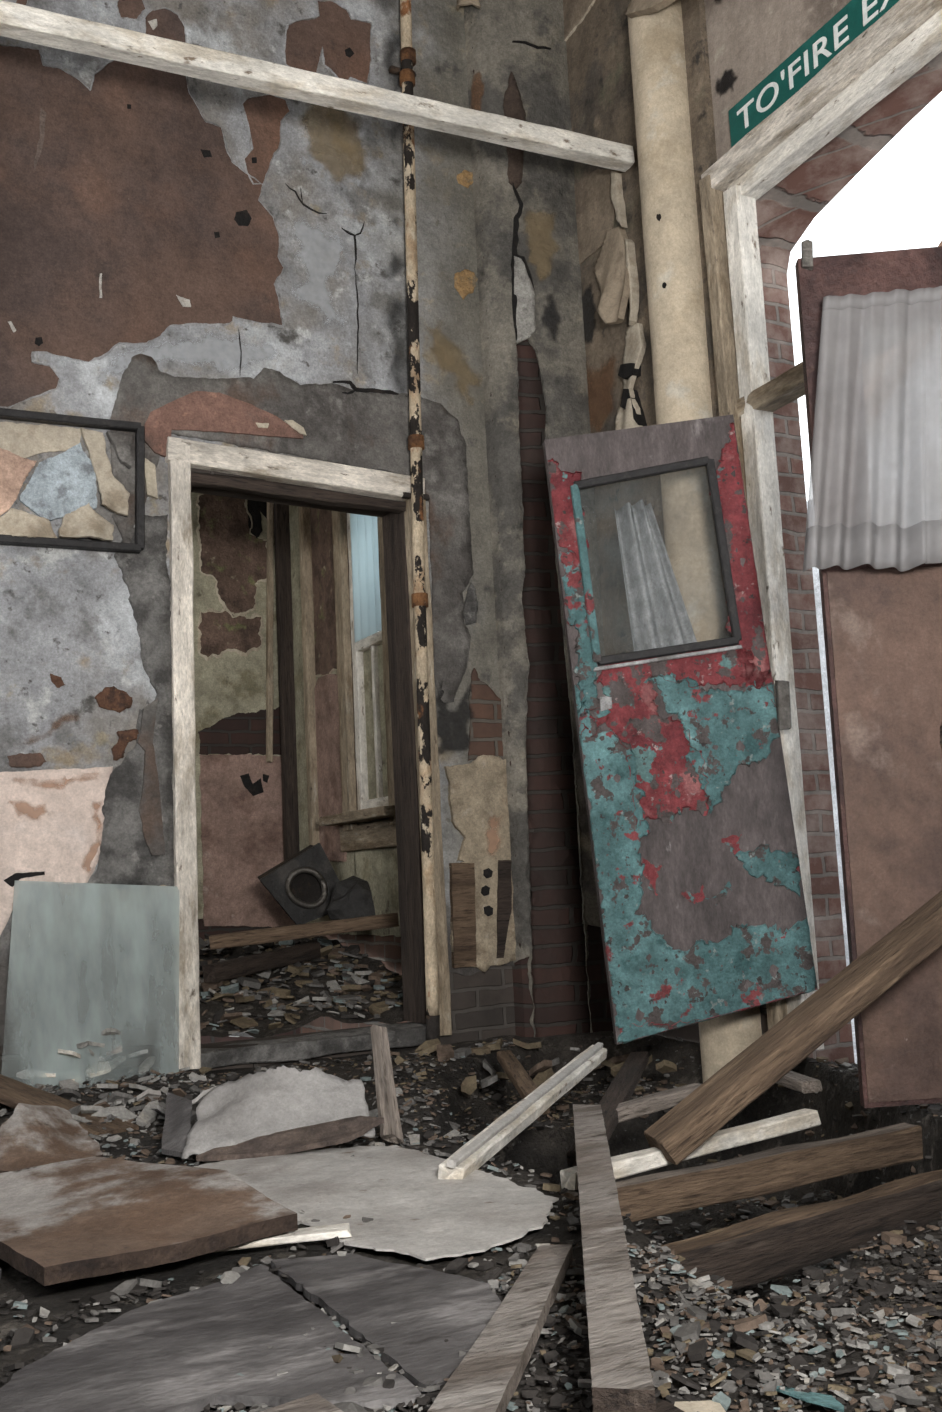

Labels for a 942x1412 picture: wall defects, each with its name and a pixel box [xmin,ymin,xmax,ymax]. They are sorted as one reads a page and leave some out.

peeling [116,0,186,43]
peeling [284,0,373,84]
peeling [503,72,526,121]
peeling [506,146,524,189]
peeling [0,44,290,409]
crack [285,183,407,397]
peeling [145,458,158,499]
peeling [195,493,267,661]
flaking render [513,256,593,1038]
flaking render [87,514,175,887]
flaking render [198,706,281,755]
flaking render [468,668,504,761]